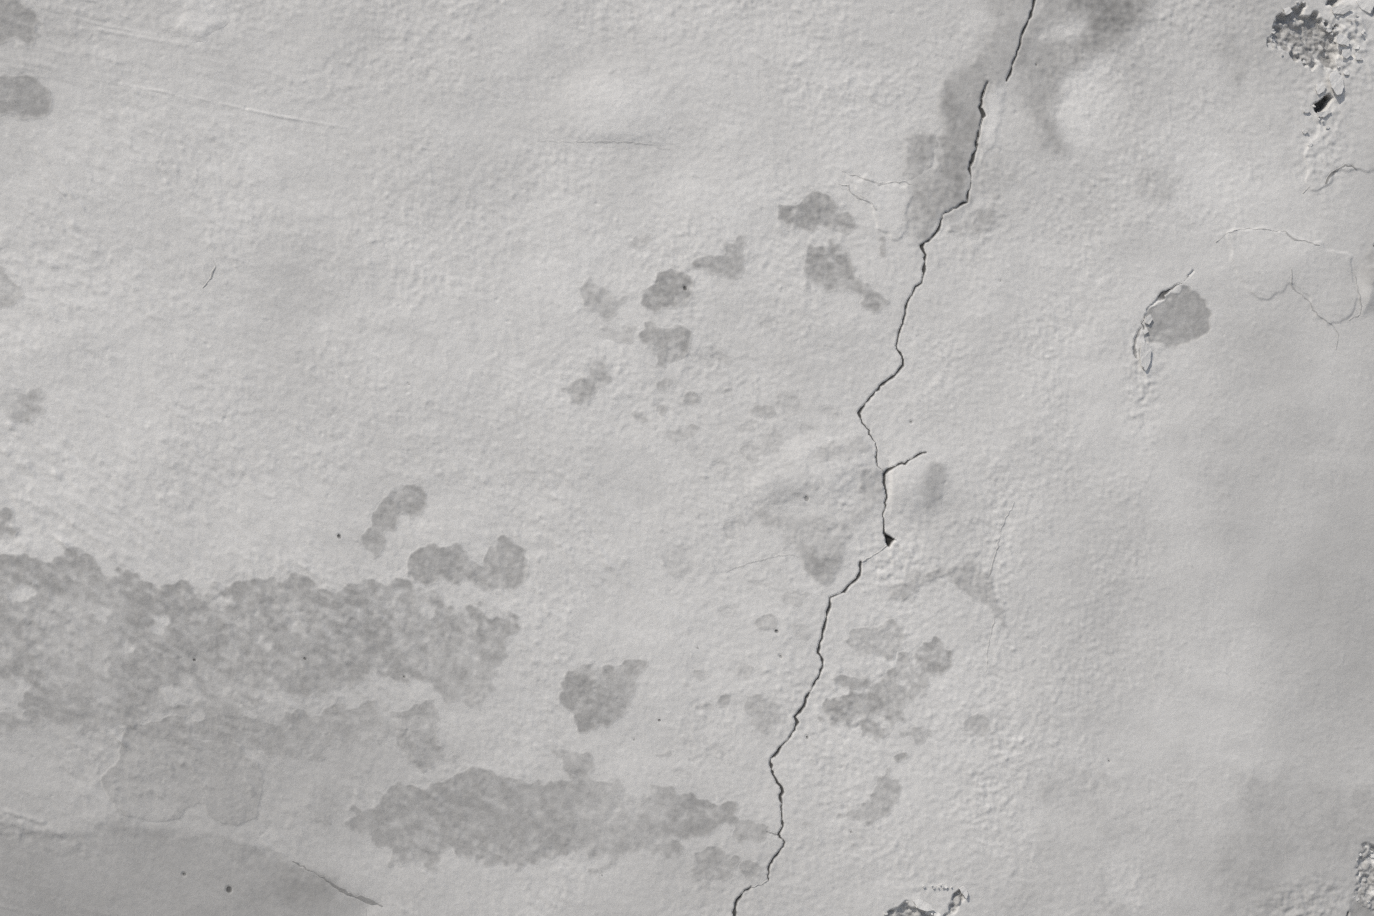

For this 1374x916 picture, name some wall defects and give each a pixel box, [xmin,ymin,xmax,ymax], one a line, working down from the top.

damp [889,0,1162,255]
flaking render [1266,0,1374,147]
crack [1302,164,1357,194]
peeling [1132,274,1214,371]
crack [1215,227,1363,350]
crack [726,0,1036,916]
flaking render [884,883,968,916]
flaking render [1347,842,1374,916]